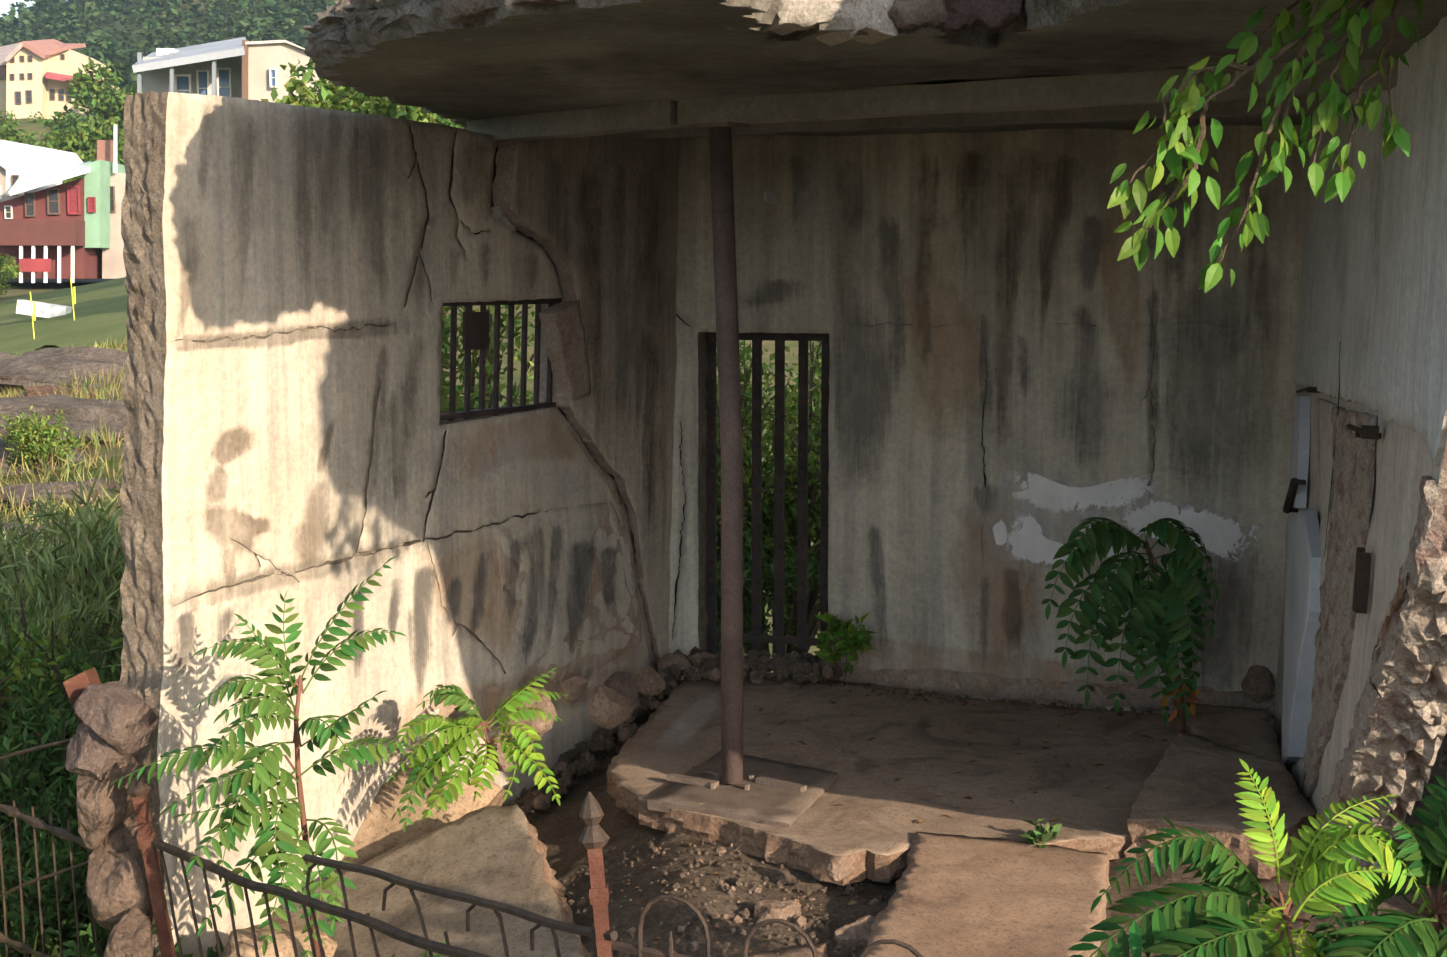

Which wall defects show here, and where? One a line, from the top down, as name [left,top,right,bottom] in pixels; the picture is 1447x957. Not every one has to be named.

spalling [440,0,575,24]
spalling [761,0,1024,46]
crack [404,126,564,307]
leakage [1151,151,1200,212]
leakage [179,614,193,667]
leakage [245,515,269,548]
crack [231,539,300,583]
leakage [391,555,486,687]
crack [423,431,506,674]
leakage [509,529,616,660]
crack [557,407,686,669]
spalling [1301,407,1439,835]